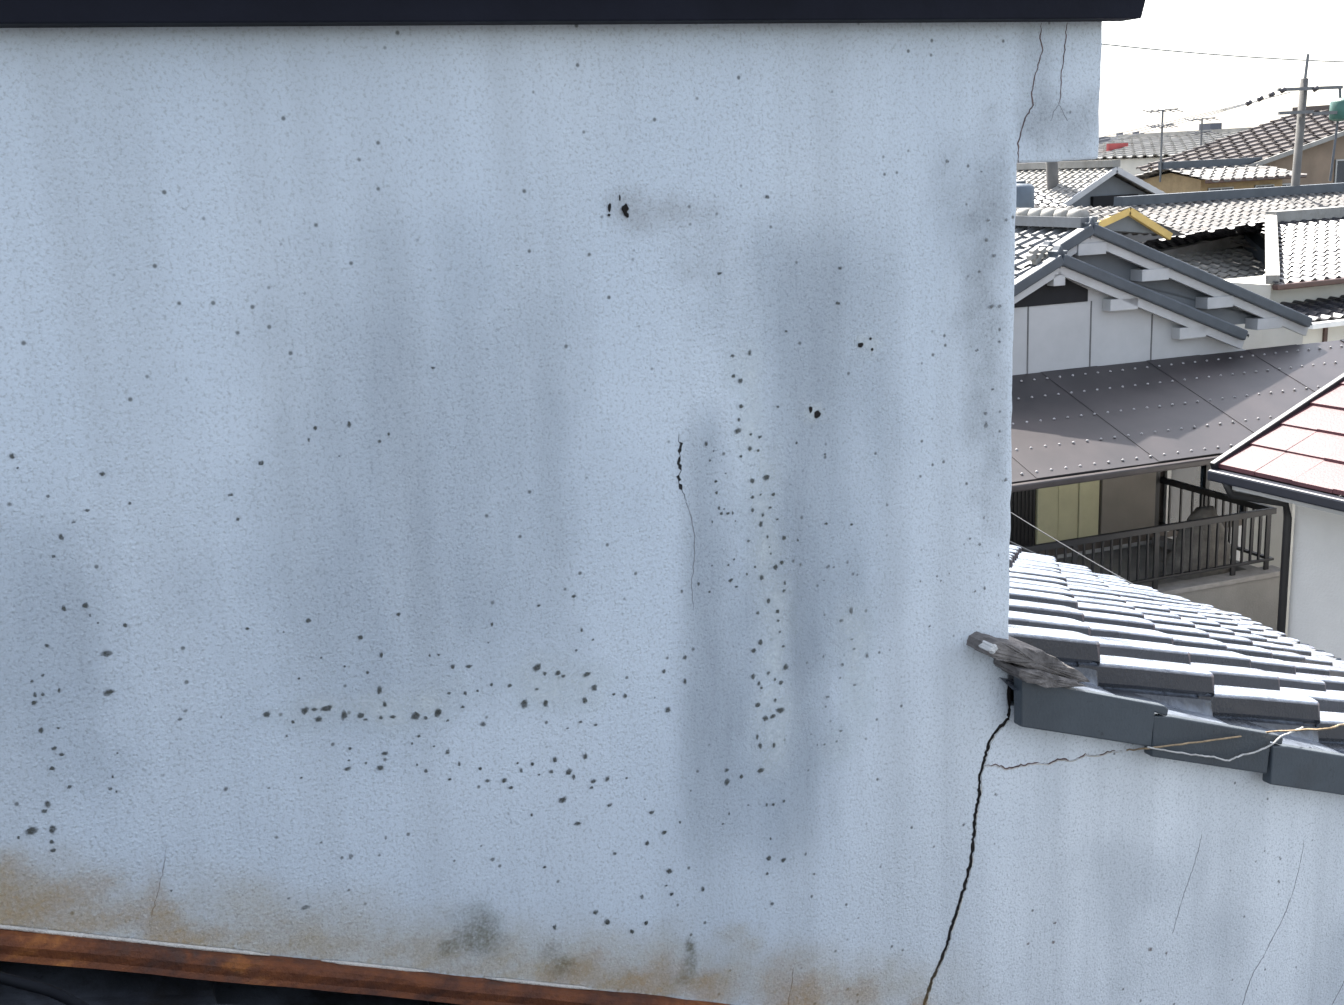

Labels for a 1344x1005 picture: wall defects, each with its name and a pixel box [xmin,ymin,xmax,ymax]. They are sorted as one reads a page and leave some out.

crack [1017,23,1068,162]
crack [676,439,695,608]
damp [712,475,799,647]
damp [286,687,396,737]
damp [521,664,565,708]
damp [752,660,788,721]
damp [17,801,56,852]
crack [923,686,1122,1005]